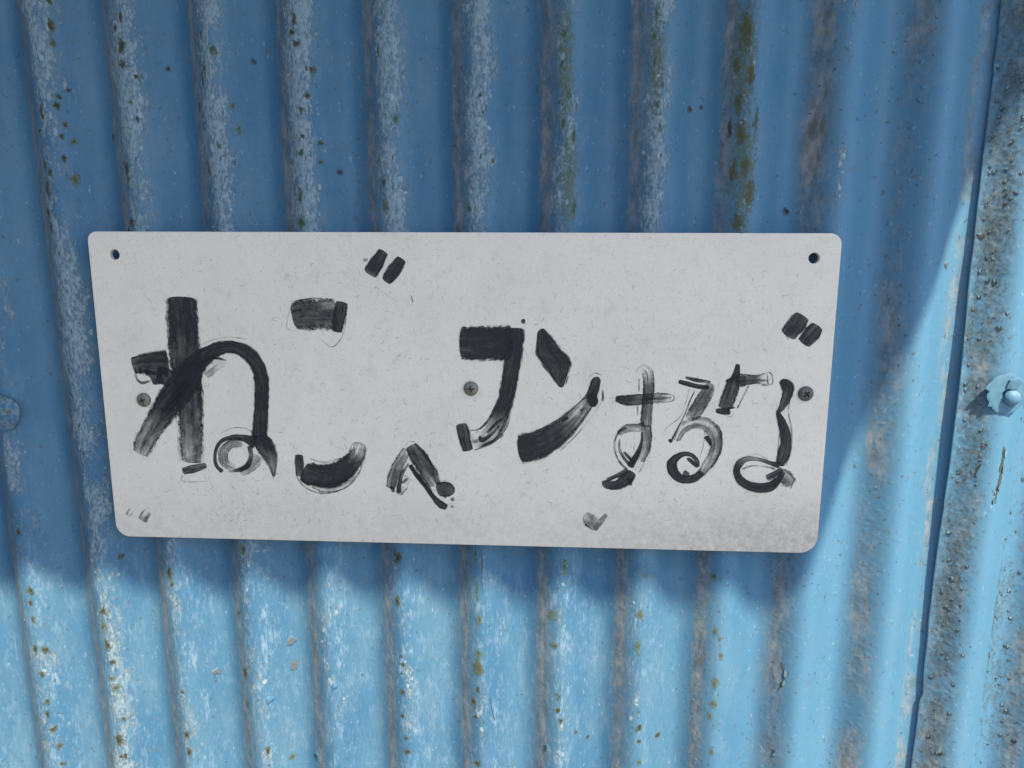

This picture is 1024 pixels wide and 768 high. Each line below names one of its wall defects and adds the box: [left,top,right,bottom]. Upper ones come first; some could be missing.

rust [39,94,62,133]
rust [59,122,81,188]
rust [43,160,53,232]
rust [100,607,122,693]
rust [471,649,484,719]
rust [114,717,128,759]